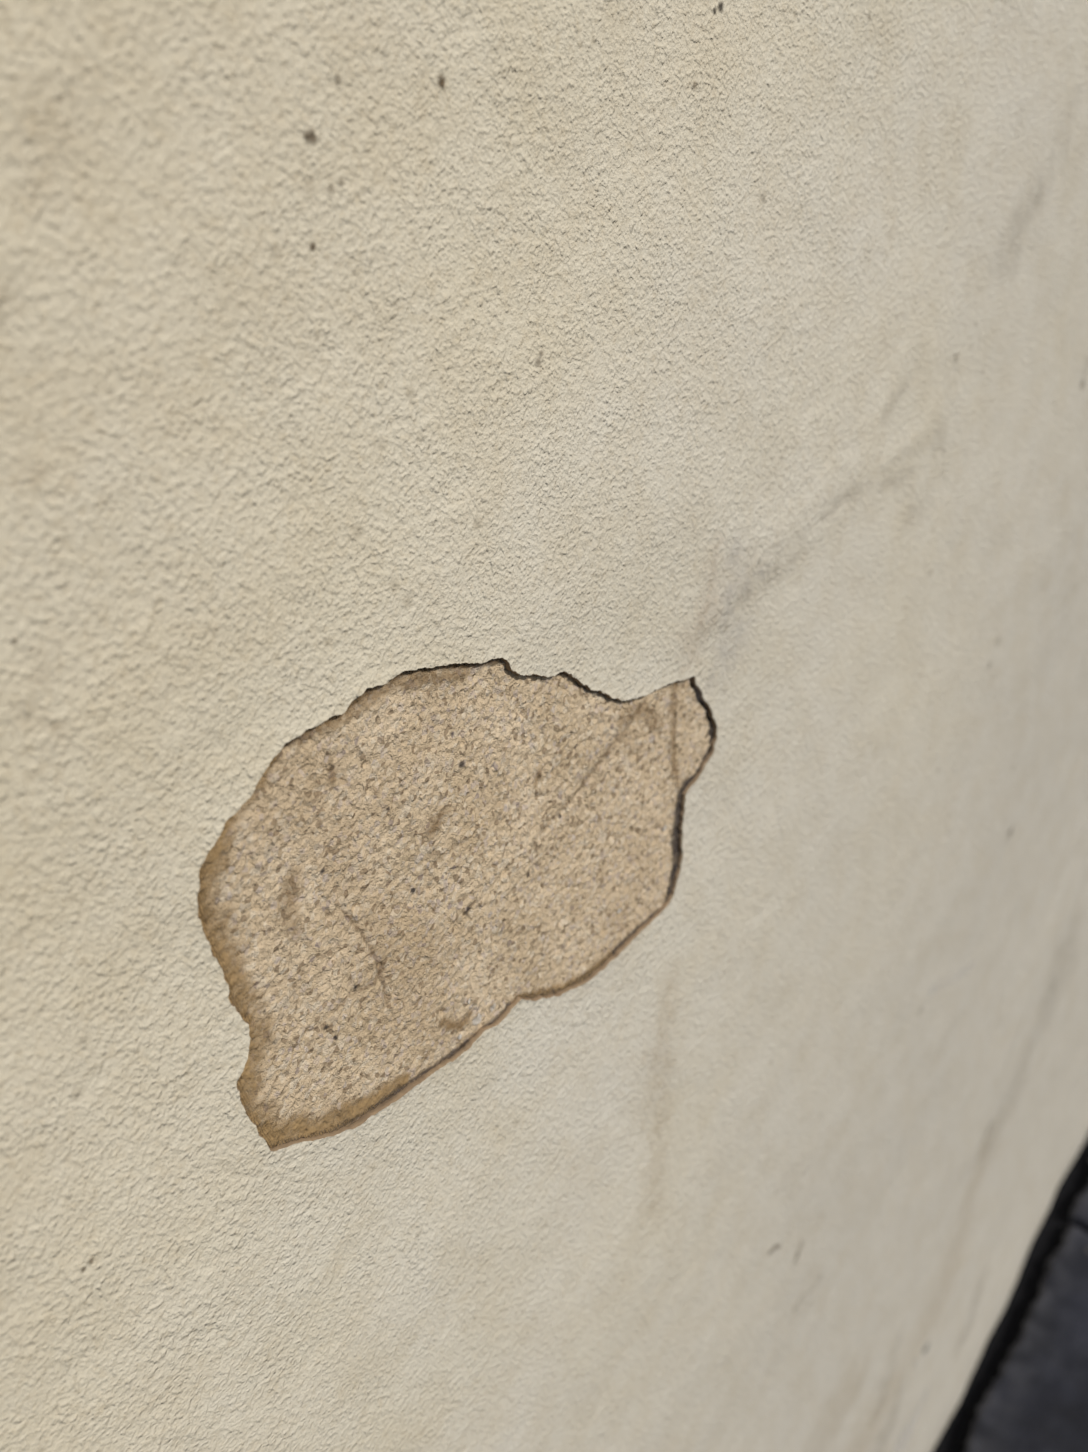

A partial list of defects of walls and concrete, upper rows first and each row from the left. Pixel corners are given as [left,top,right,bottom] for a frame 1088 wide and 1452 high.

peeling [197,658,717,1151]